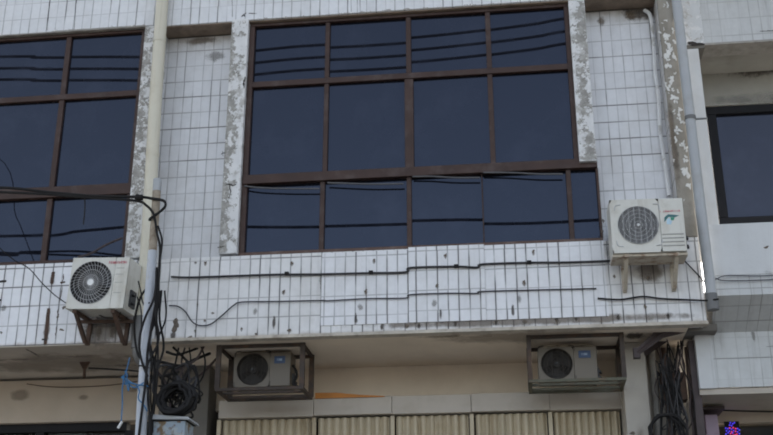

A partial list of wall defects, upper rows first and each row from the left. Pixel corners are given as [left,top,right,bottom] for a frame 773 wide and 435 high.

peeling [54,24,154,256]
peeling [219,0,550,253]
peeling [570,1,596,160]
peeling [658,20,691,190]
peeling [682,0,704,46]